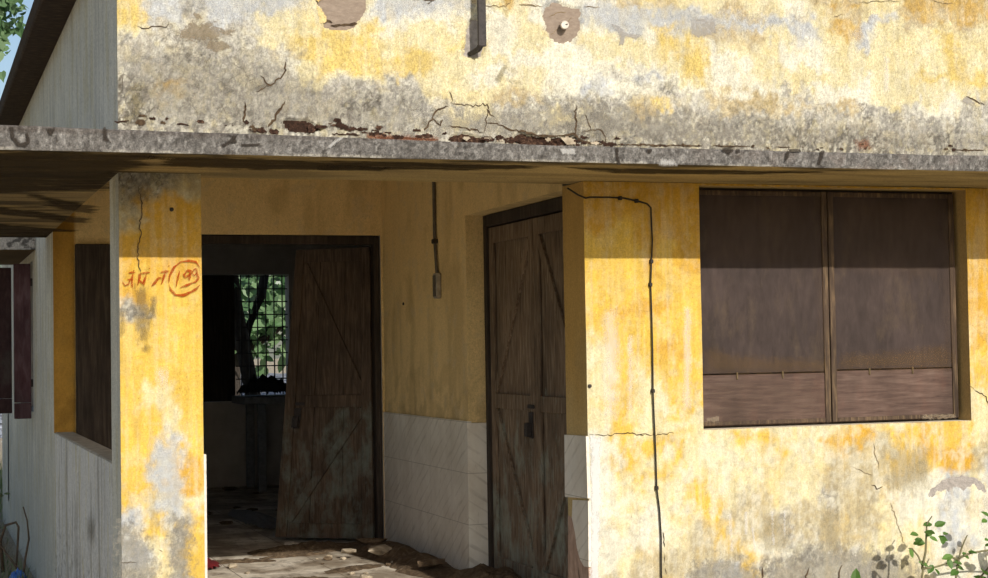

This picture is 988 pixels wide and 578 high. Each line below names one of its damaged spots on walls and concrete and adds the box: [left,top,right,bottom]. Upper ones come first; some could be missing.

spalling [315,0,366,30]
spalling [542,3,581,44]
crack [242,61,286,133]
spalling [125,115,169,125]
spalling [225,118,623,147]
crack [332,91,748,147]
crack [136,187,144,273]
crack [592,430,673,438]